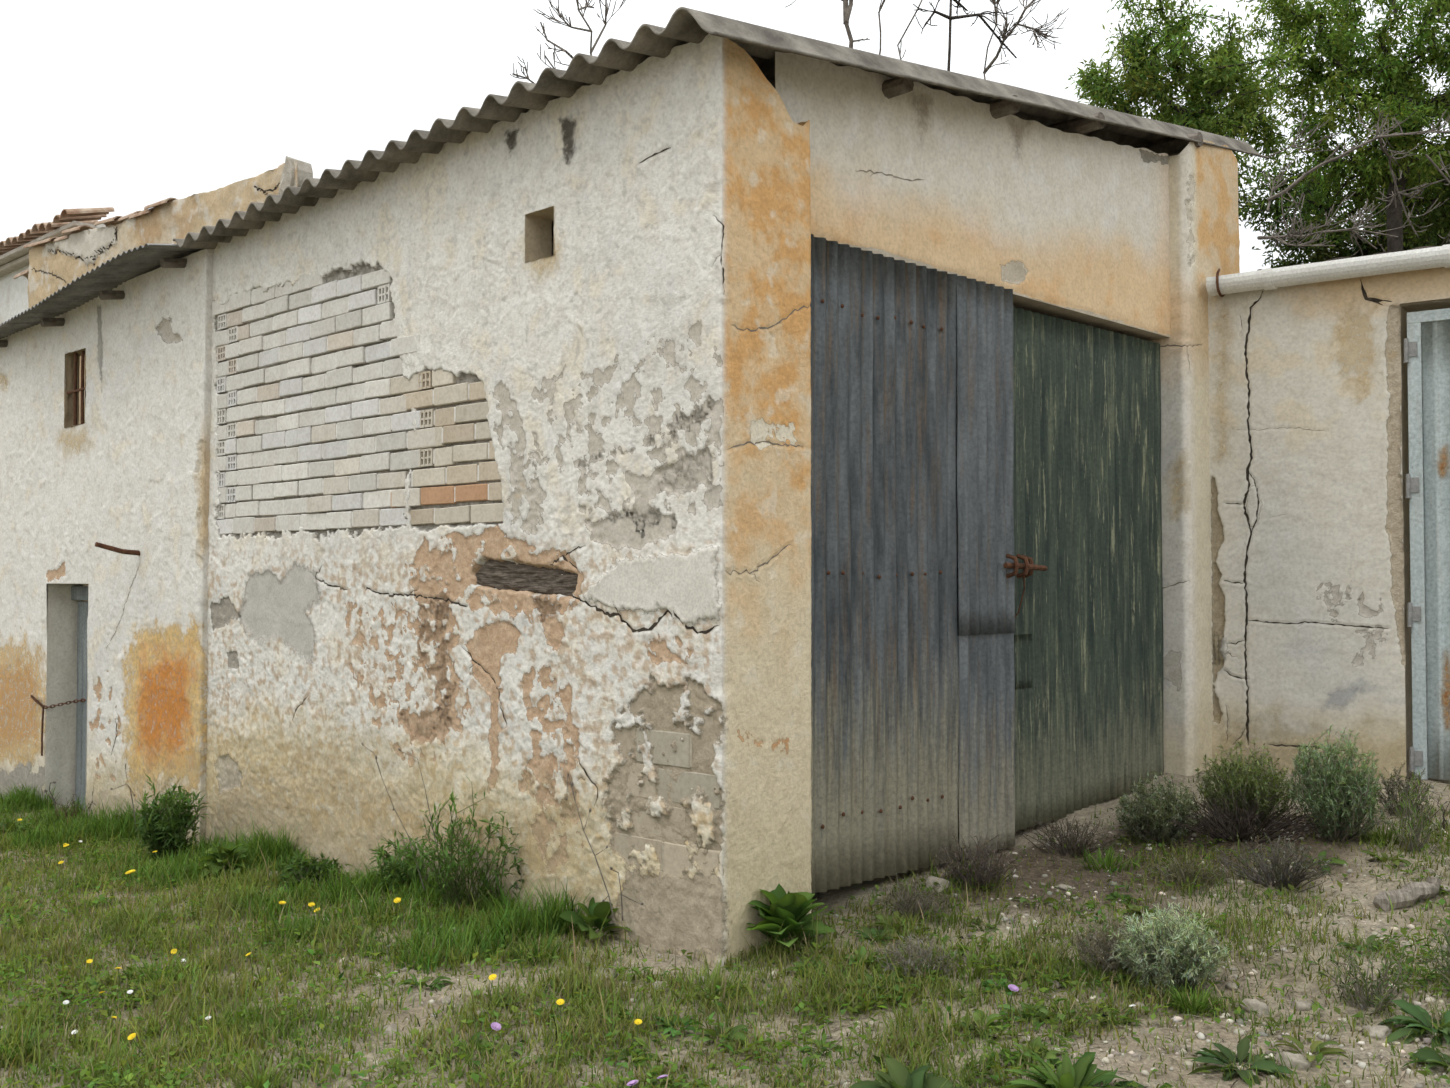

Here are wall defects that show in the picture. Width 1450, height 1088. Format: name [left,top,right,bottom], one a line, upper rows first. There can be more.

crack [735,305,810,332]
crack [1160,344,1201,376]
rust [1438,447,1447,476]
crack [1223,291,1389,752]
flaking render [200,261,724,874]
crack [550,545,718,634]
rust [1442,657,1450,729]